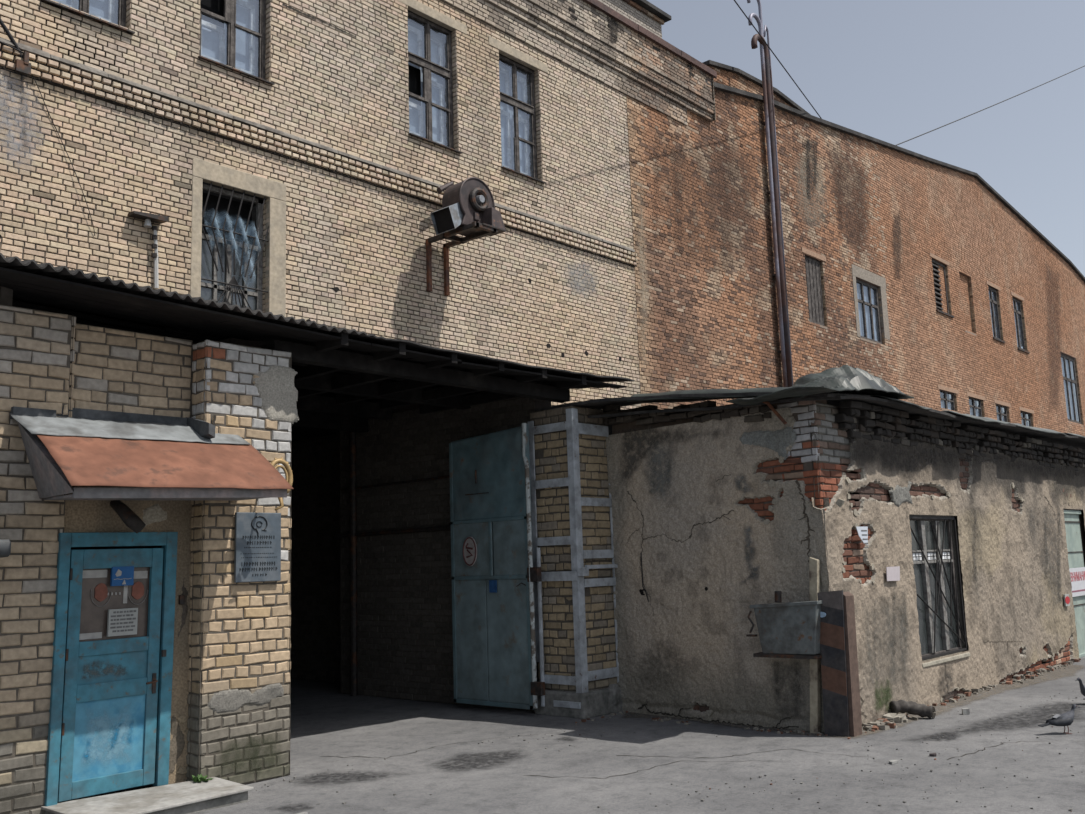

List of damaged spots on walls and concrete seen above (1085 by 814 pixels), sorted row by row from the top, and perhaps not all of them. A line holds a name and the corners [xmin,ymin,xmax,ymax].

crack [626,491,734,619]
spalling [738,400,895,584]
spalling [908,450,973,499]
spalling [999,638,1070,682]